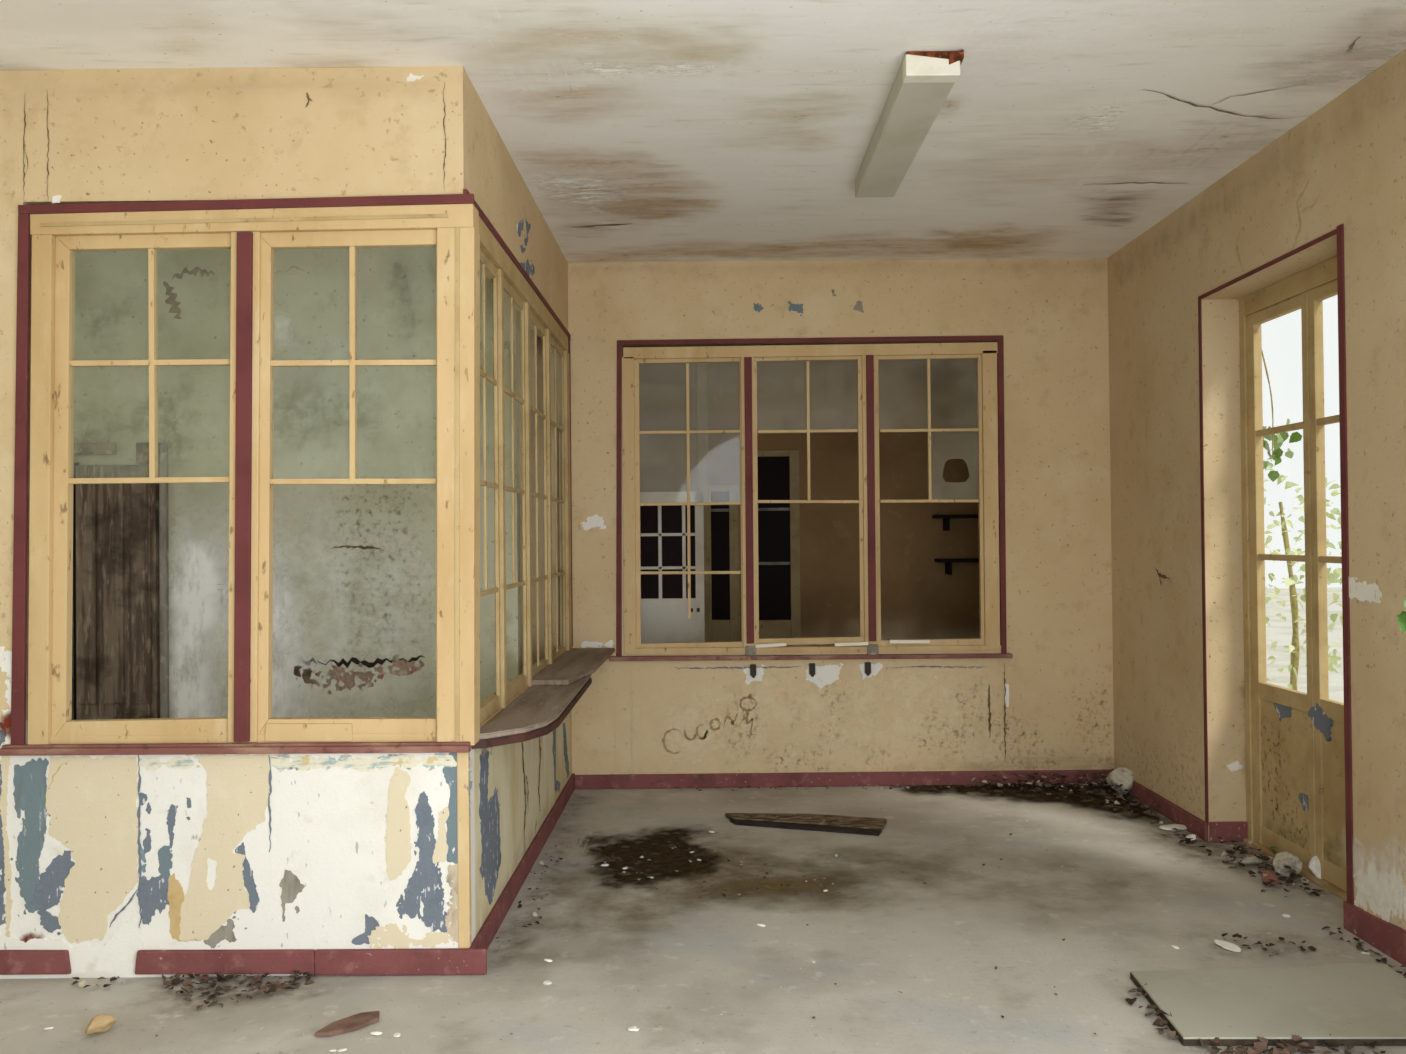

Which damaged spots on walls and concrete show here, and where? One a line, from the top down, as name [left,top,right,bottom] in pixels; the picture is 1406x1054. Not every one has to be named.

crack [1142,82,1311,119]
peeling [788,301,805,318]
flaking render [743,664,765,685]
flaking render [806,663,883,689]
peeling [552,722,570,792]
peeling [0,646,501,975]
water stain [580,829,846,896]